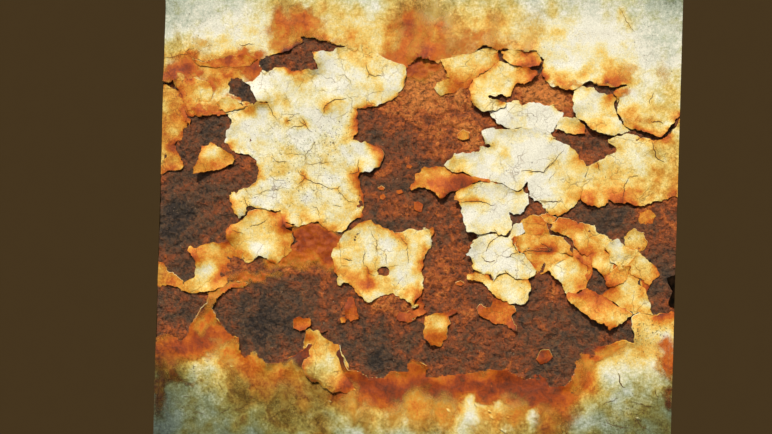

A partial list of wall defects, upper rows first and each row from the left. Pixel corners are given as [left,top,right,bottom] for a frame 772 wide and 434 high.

crack [234,107,359,234]
peeling [158,43,457,347]
rust [154,0,637,434]
peeling [409,47,680,332]
rust [506,73,680,166]
rust [509,197,677,315]
peeling [293,317,356,402]
peeling [536,349,553,364]
rust [656,337,673,409]